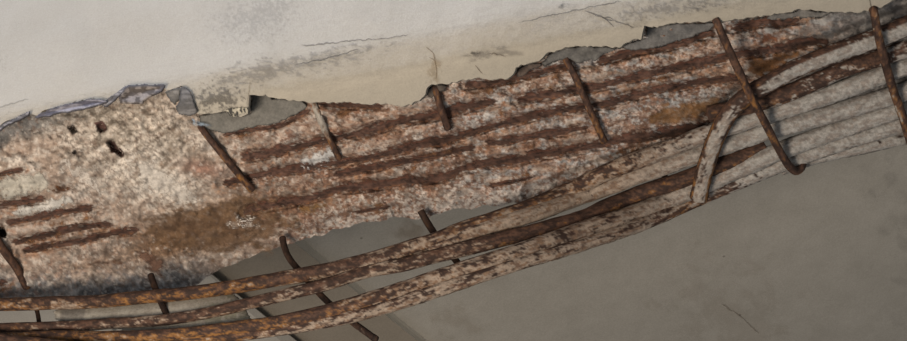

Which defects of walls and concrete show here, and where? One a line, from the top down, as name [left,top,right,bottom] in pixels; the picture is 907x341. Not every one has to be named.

spalling [0,21,742,298]
corrosion [0,18,829,276]
spalling [722,0,907,83]
spalling [838,76,907,102]